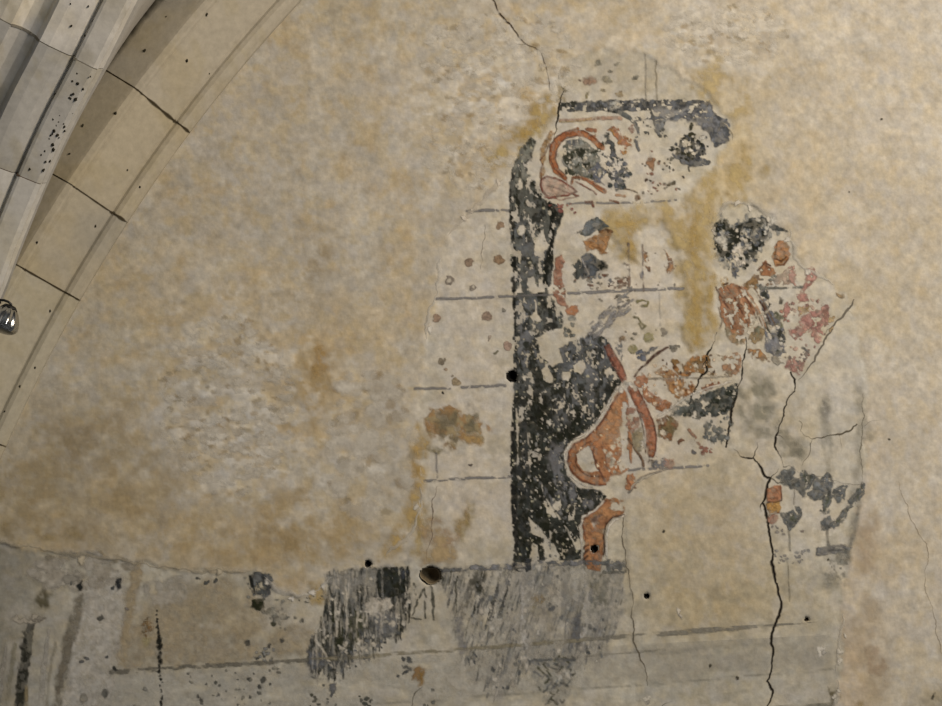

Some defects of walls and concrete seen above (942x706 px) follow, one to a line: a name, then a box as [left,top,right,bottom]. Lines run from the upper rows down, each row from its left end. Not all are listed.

crack [493,0,565,128]
damp [662,173,717,344]
crack [689,347,712,405]
crack [725,300,854,706]
crack [810,410,865,469]